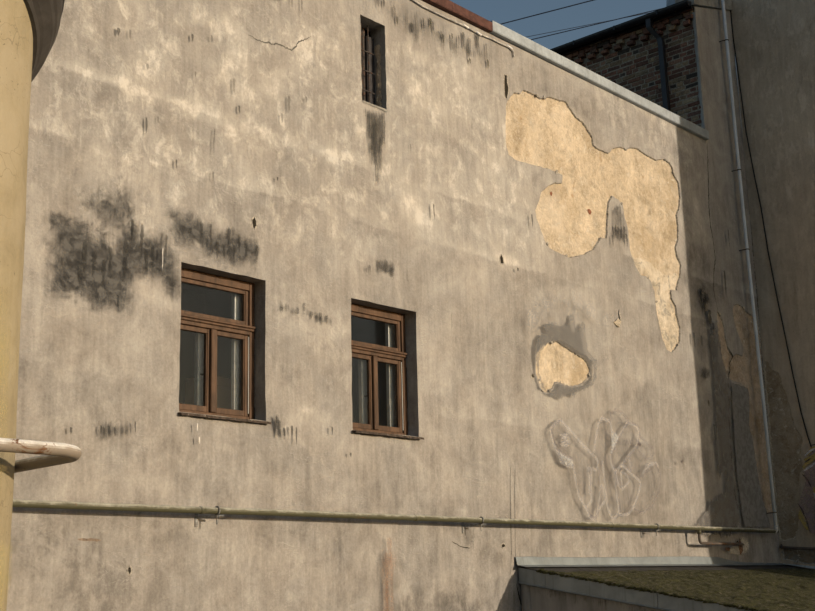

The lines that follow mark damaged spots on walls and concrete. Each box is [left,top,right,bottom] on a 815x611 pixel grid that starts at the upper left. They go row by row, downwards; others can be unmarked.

crack [250,35,311,51]
water stain [365,110,385,162]
water stain [91,197,131,219]
water stain [50,215,177,311]
water stain [170,214,258,262]
spalling [503,74,681,353]
spalling [531,341,591,393]
peeling [717,304,815,564]